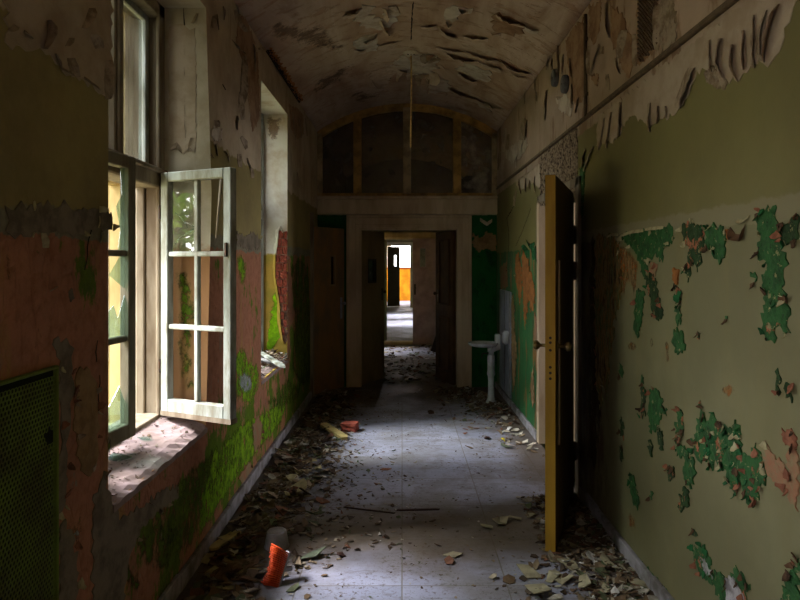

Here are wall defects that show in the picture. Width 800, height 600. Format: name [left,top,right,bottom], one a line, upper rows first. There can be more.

peeling [210,4,267,178]
peeling [393,17,584,120]
peeling [490,12,539,37]
peeling [579,0,797,218]
peeling [4,200,120,248]
flaking render [272,226,289,344]
peeling [500,240,537,392]
peeling [591,205,800,410]
water stain [240,374,252,391]
peeling [635,375,800,513]
peeling [687,528,751,600]
peeling [780,552,800,600]